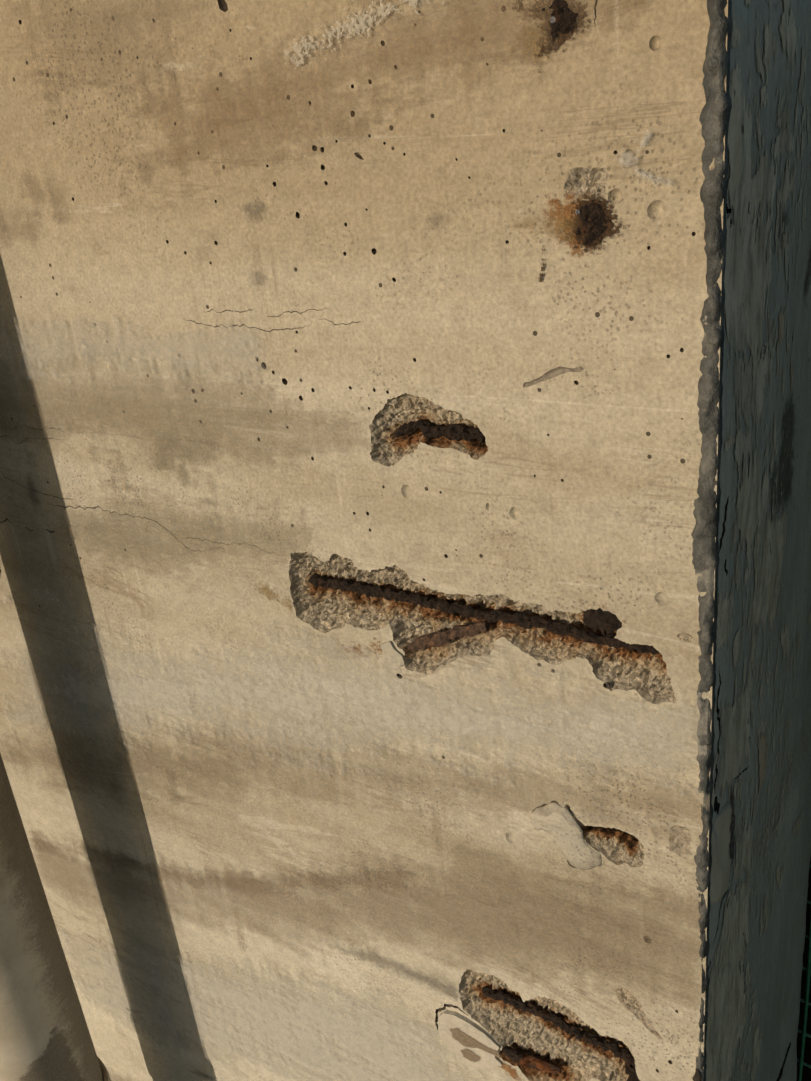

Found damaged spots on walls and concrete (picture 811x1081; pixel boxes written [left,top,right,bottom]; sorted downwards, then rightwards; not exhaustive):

peeling [756,0,798,72]
corrosion [544,189,624,256]
peeling [718,19,778,557]
spalling [369,393,488,467]
spalling [288,552,677,704]
peeling [716,588,734,651]
spalling [565,803,644,867]
peeling [700,682,762,1081]
spalling [438,969,640,1081]